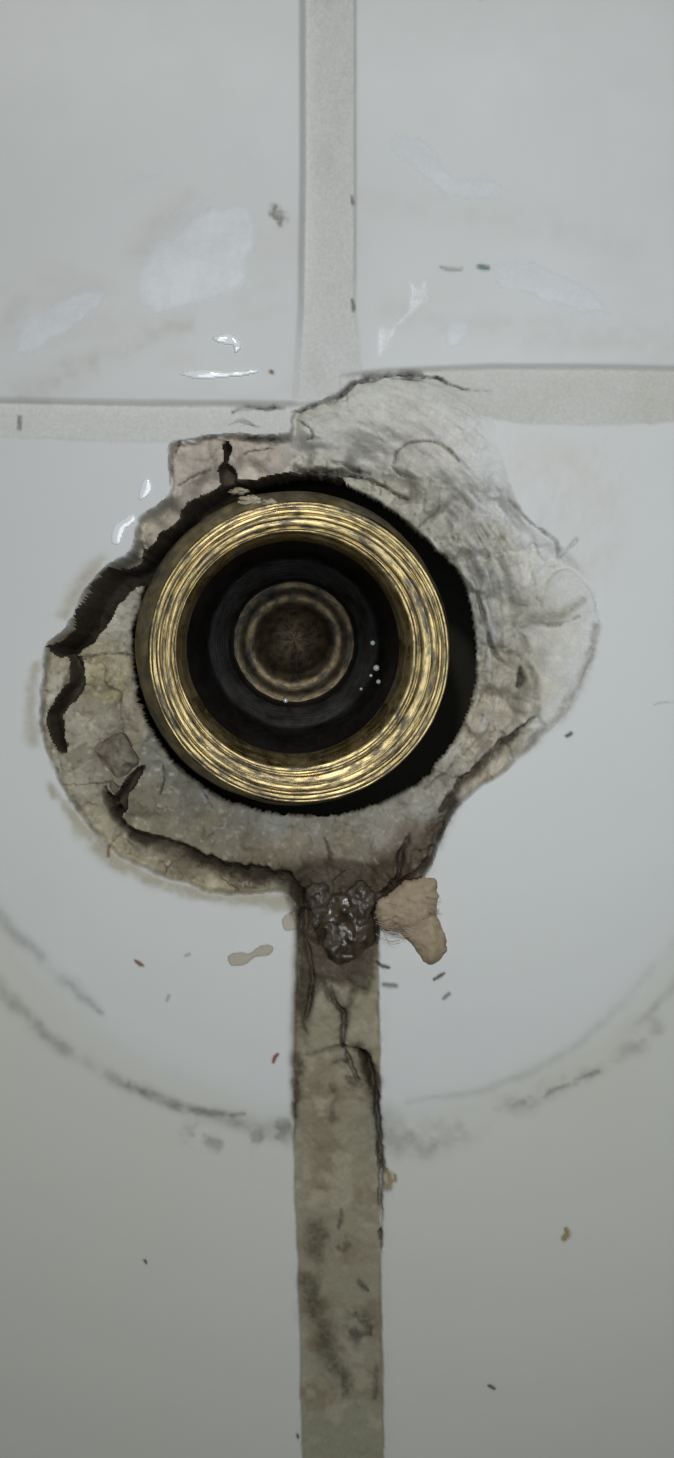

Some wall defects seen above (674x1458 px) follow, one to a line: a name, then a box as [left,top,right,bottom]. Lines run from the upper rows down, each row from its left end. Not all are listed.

crack [108,765,253,870]
crack [45,375,463,753]
spalling [37,369,605,939]
crack [375,1100,383,1247]